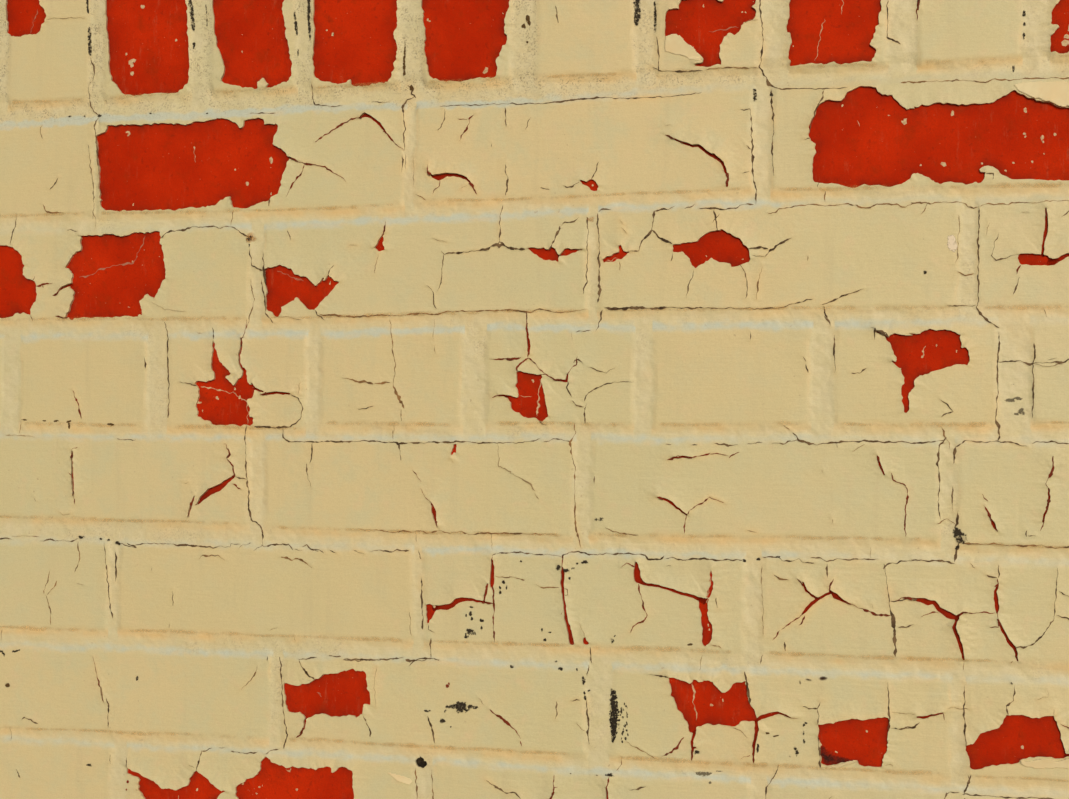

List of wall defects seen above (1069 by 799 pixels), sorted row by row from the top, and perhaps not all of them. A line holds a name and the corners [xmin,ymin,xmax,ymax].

peeling [107,0,189,96]
peeling [213,0,292,89]
peeling [313,0,397,87]
peeling [422,0,509,82]
peeling [787,0,881,66]
peeling [97,118,291,212]
crack [268,83,477,206]
crack [438,92,702,140]
peeling [809,81,1069,188]
peeling [66,231,166,320]
crack [622,0,1069,744]
crack [104,165,866,770]